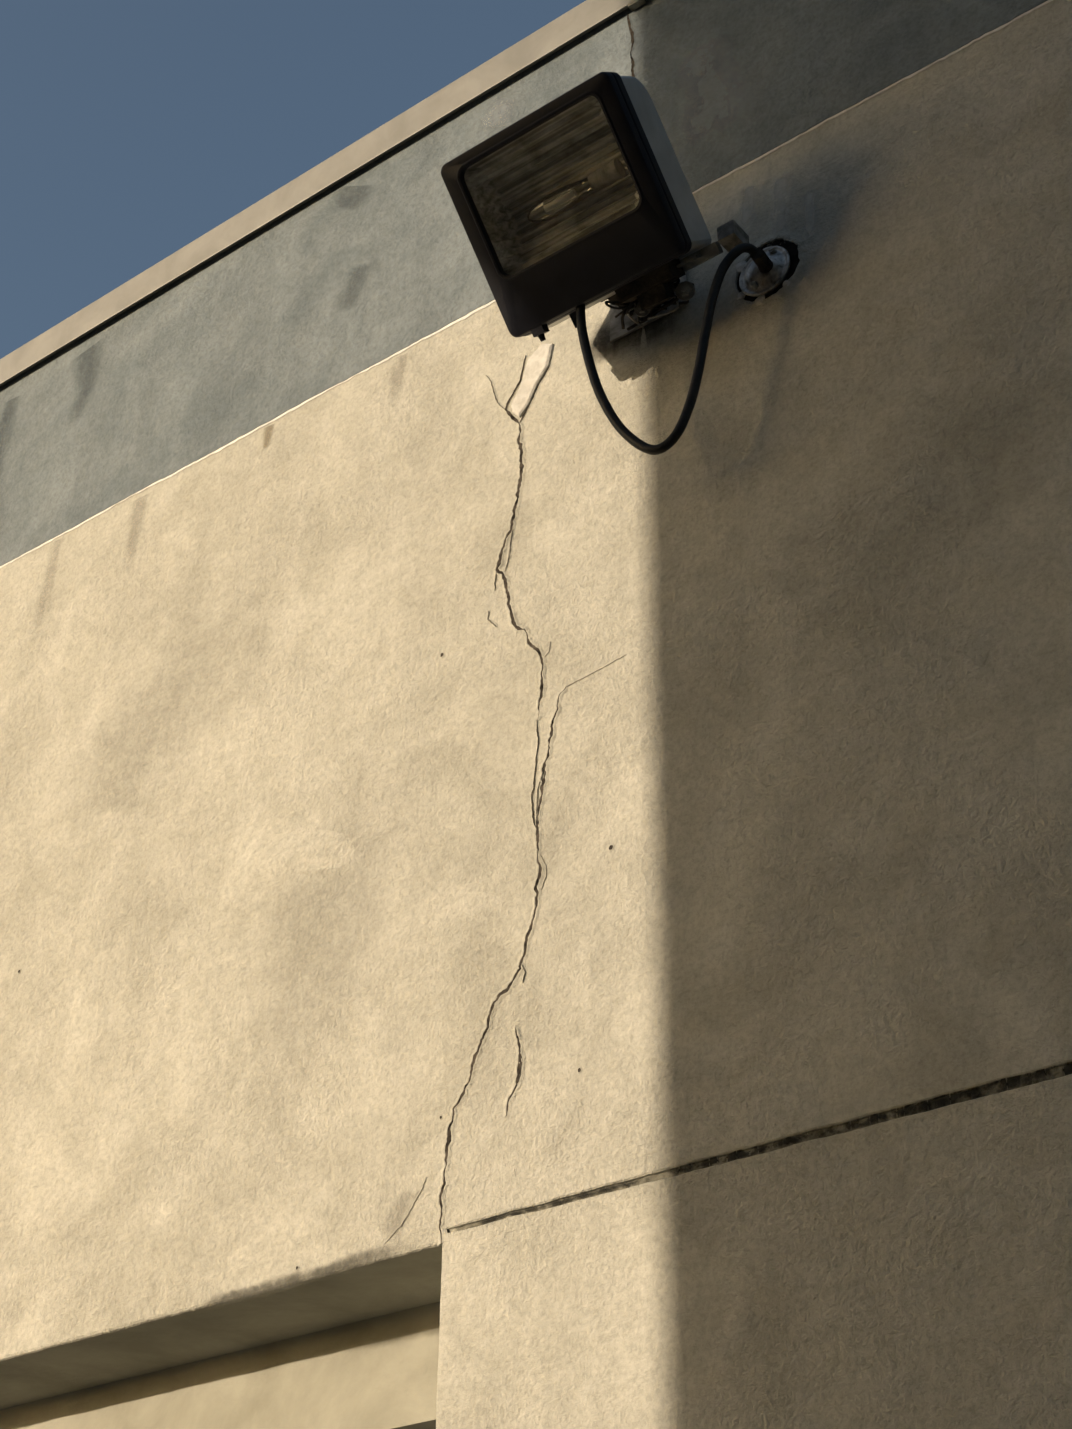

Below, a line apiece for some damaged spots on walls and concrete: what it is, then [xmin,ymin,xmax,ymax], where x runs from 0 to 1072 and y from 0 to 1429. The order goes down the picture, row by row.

crack [626,13,637,79]
crack [385,343,626,1246]